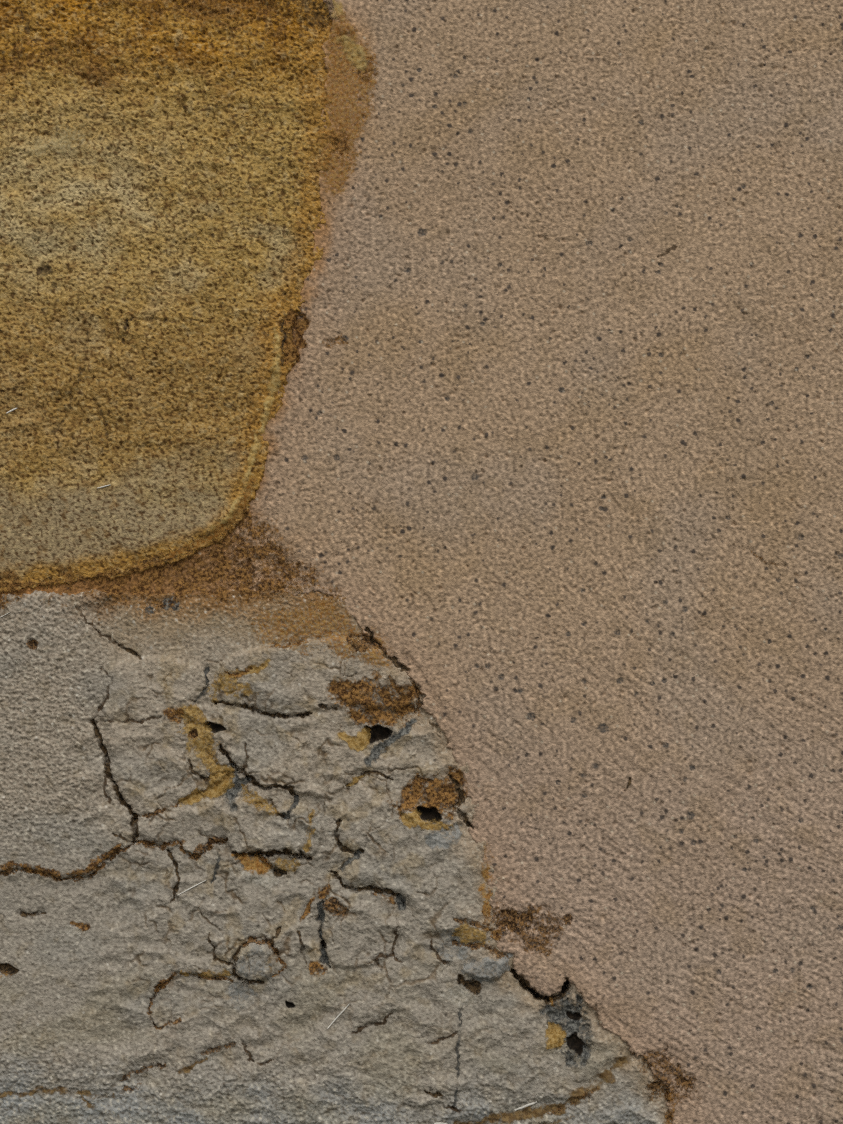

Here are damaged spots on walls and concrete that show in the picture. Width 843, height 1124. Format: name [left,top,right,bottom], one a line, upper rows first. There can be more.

peeling [301,0,377,195]
spalling [280,309,309,366]
crack [75,606,141,659]
peeling [163,704,220,771]
spalling [329,671,421,767]
crack [365,627,437,727]
crack [0,667,406,1029]
spalling [392,767,473,849]
crack [242,1043,272,1065]
crack [353,1013,393,1034]
crack [424,1008,462,1114]
spalling [441,953,593,1067]